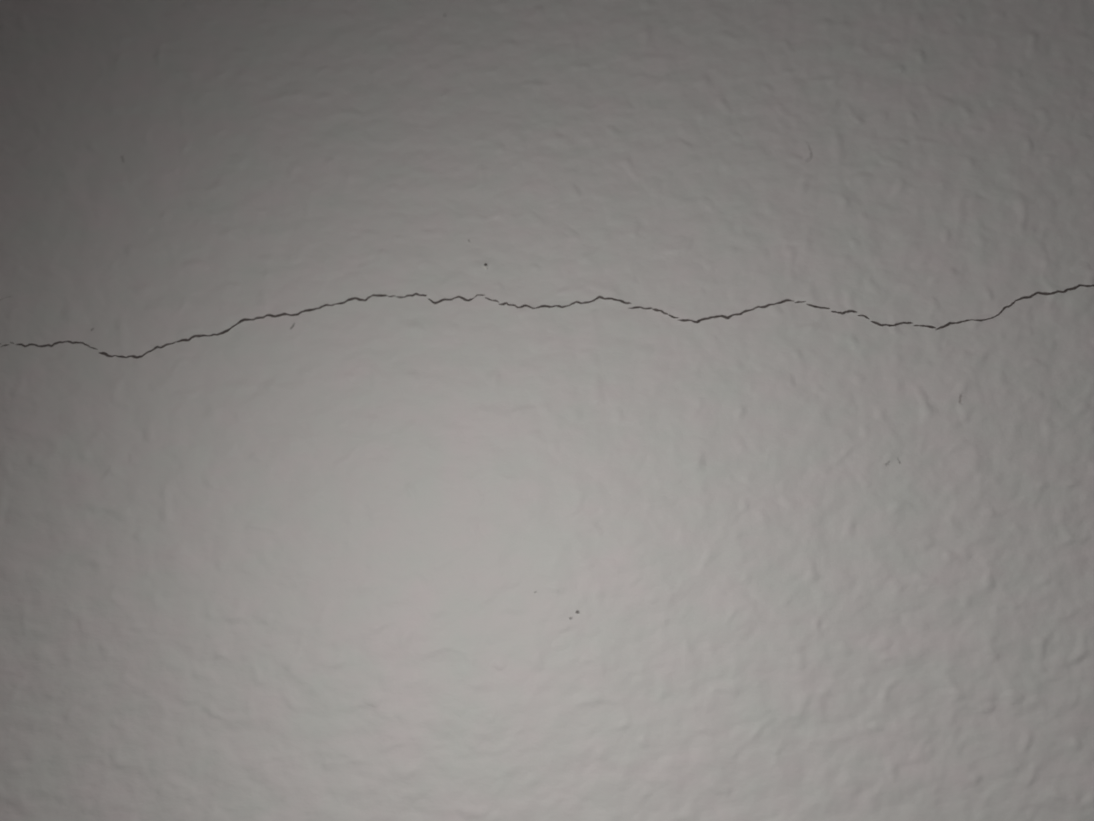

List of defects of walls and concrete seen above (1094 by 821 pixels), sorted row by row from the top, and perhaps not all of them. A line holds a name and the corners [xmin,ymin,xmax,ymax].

crack [0,283,1094,360]